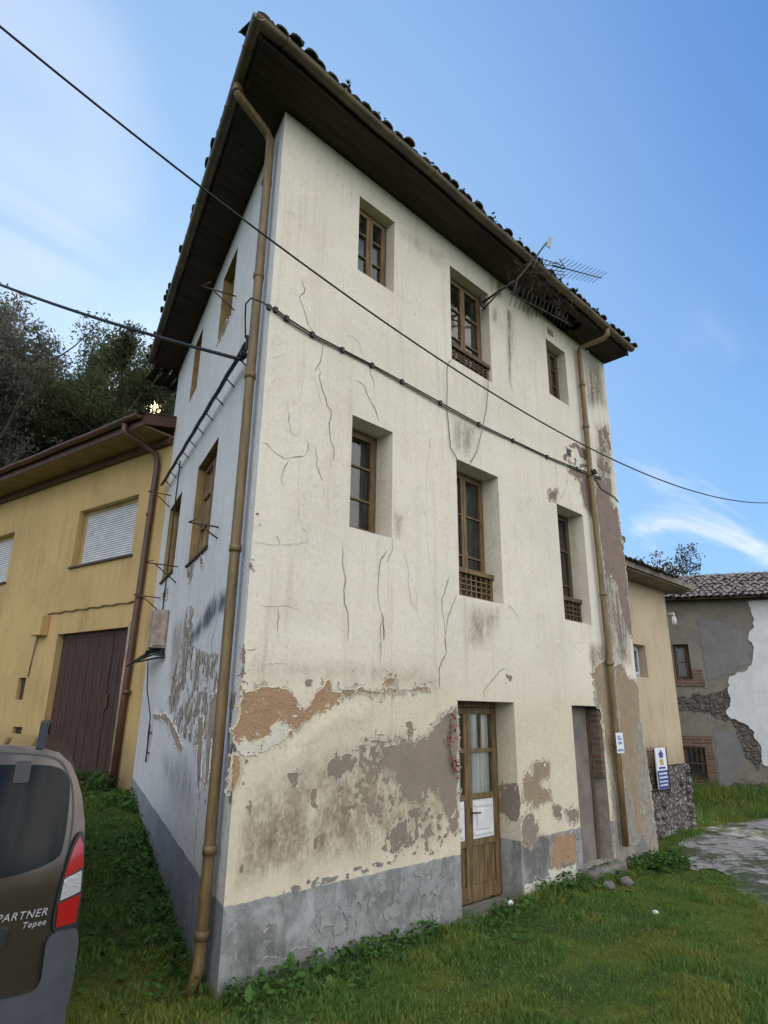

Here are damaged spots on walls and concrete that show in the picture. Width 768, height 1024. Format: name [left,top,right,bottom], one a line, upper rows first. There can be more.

crack [262,285,334,496]
spalling [563,425,634,639]
peeling [153,606,218,802]
spalling [224,644,431,803]
peeling [677,600,768,790]
peeling [236,704,462,994]
spalling [498,757,580,895]